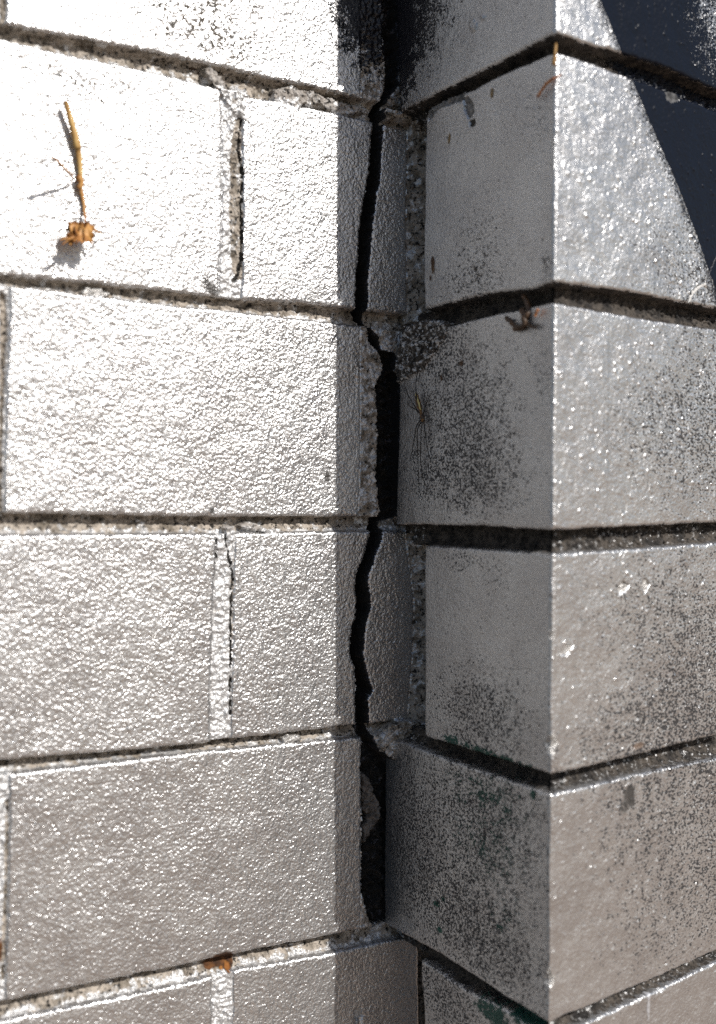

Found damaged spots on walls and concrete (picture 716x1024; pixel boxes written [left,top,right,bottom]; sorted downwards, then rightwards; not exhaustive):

crack [231,119,245,282]
crack [350,0,400,925]
corrosion [202,951,233,973]